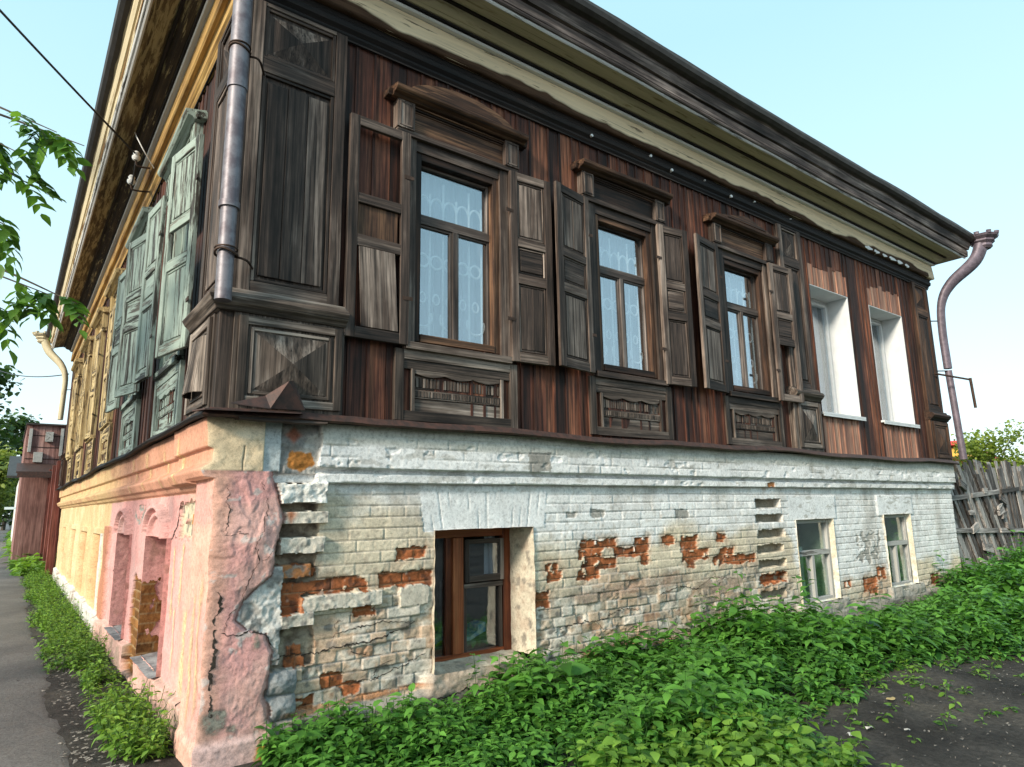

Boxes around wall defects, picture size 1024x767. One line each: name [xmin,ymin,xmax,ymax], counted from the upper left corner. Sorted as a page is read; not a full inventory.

flaking render [121,572,162,673]
crack [205,484,427,718]
spalling [237,423,433,669]
flaking render [535,562,563,609]
flaking render [576,532,757,581]
flaking render [759,570,788,586]
flaking render [843,534,887,593]
flaking render [295,671,361,713]
flaking render [202,710,235,735]